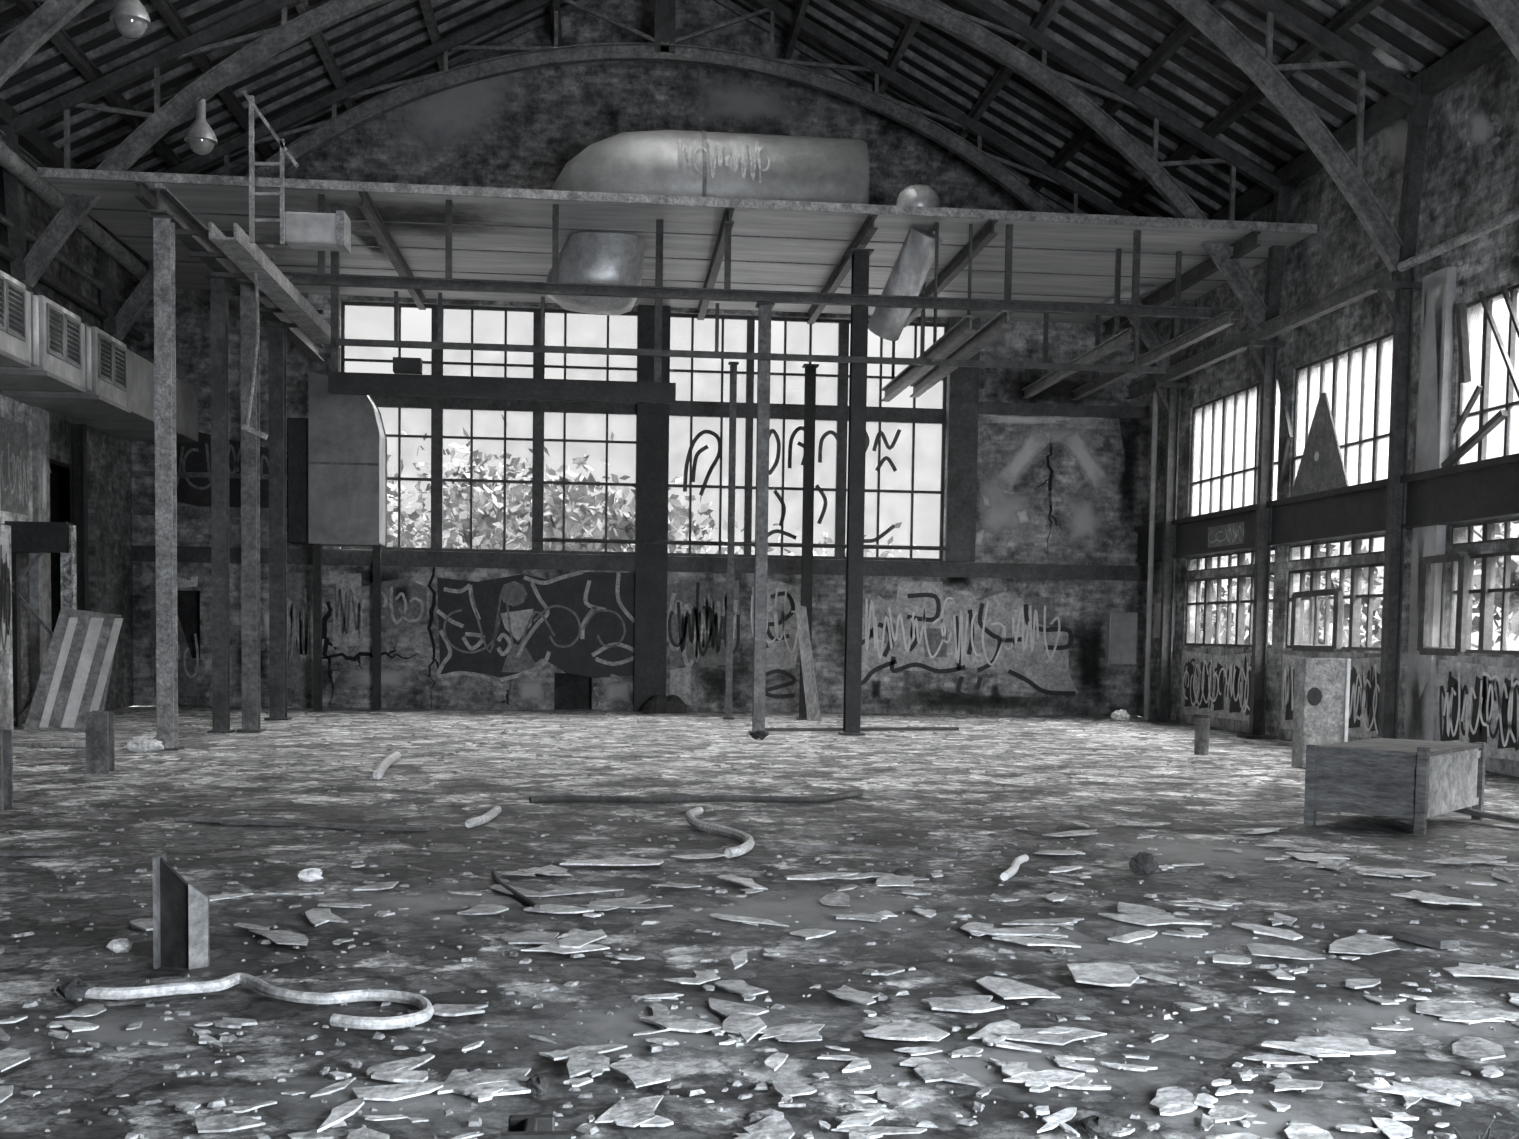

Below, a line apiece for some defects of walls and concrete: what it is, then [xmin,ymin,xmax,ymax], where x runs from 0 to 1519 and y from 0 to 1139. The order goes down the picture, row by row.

peeling [129,918,153,931]
peeling [209,821,1519,993]
peeling [0,1016,40,1103]
peeling [46,998,257,1062]
peeling [175,952,1168,1139]
peeling [1149,963,1519,1139]